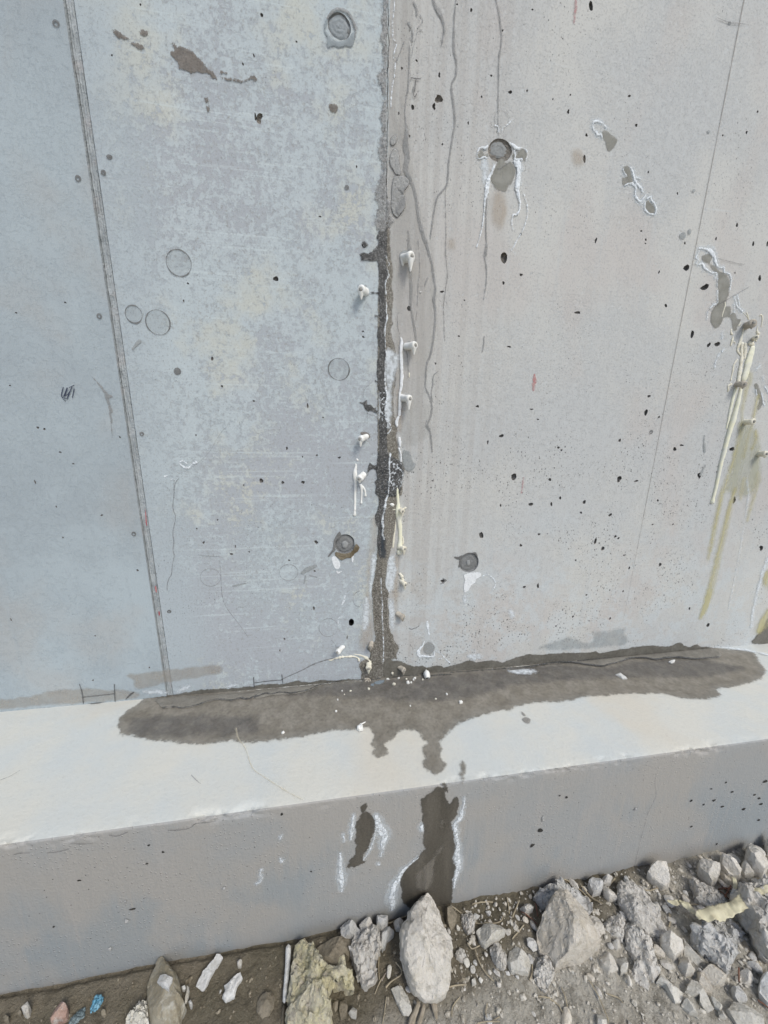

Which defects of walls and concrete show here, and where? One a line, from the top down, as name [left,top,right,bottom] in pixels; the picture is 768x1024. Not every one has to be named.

leakage [118,223,768,911]